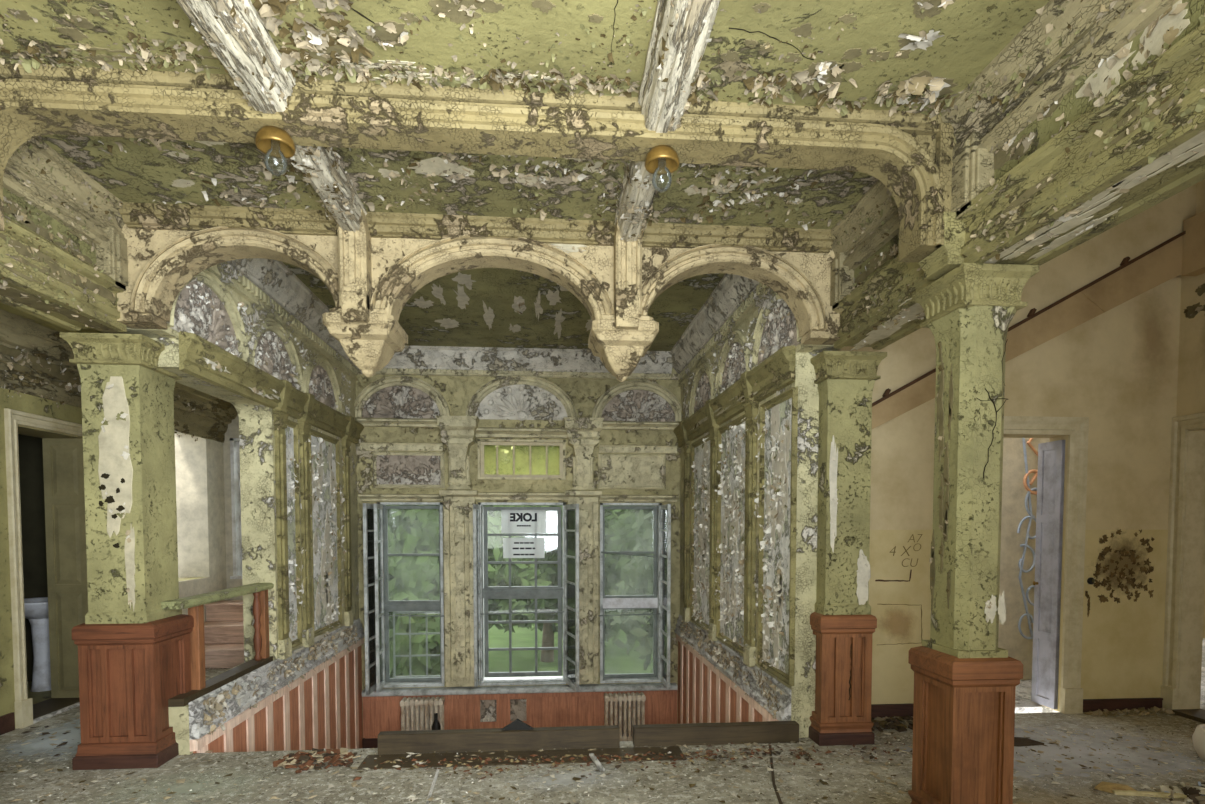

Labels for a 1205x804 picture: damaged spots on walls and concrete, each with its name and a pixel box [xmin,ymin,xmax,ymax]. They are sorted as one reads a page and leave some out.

crack [334,0,381,31]
peeling [992,0,1190,170]
peeling [157,147,205,188]
peeling [349,148,554,191]
peeling [565,158,606,186]
peeling [684,166,803,206]
peeling [984,130,1205,264]
peeling [98,376,135,611]
peeling [829,435,838,552]
peeling [929,341,954,609]
peeling [856,549,871,605]
peeling [984,590,1006,625]